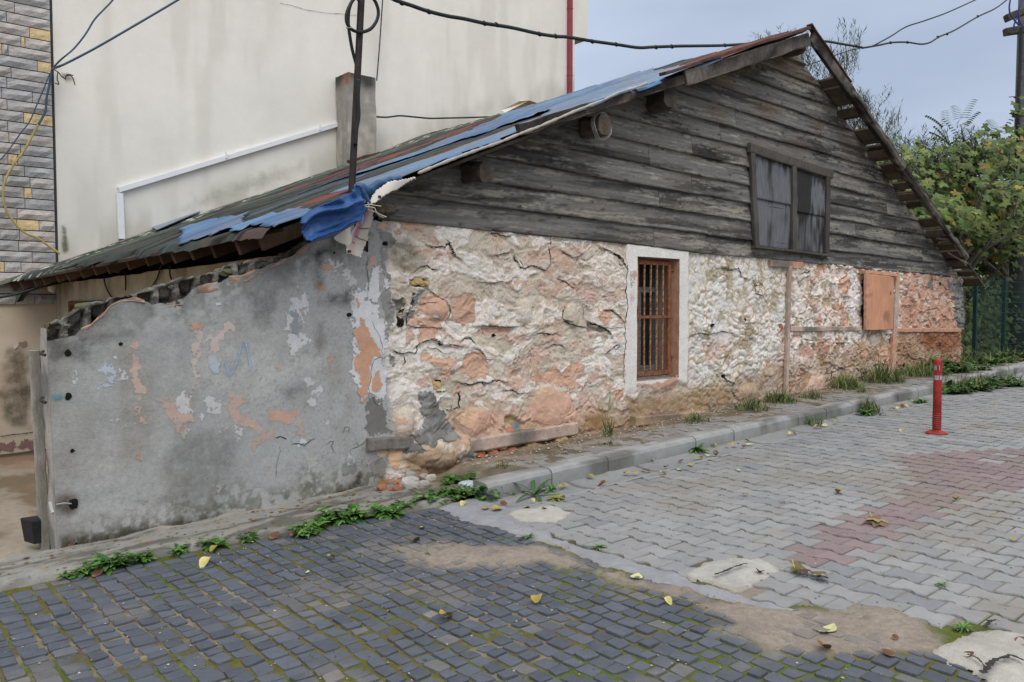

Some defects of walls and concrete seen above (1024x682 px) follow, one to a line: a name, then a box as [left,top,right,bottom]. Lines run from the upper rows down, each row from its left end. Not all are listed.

damp [0,352,27,422]
spalling [55,297,145,330]
peeling [95,319,321,473]
spalling [197,236,317,306]
crack [367,239,523,411]
crack [483,231,628,384]